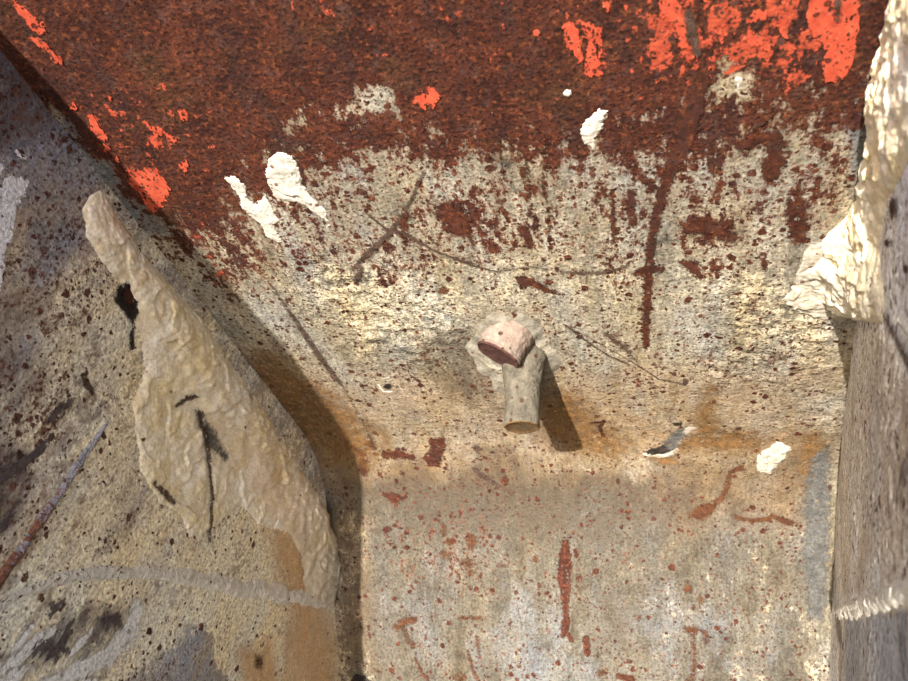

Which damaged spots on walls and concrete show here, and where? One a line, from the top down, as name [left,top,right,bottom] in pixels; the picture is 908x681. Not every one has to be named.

corrosion [703,141,716,174]
corrosion [734,109,791,181]
corrosion [399,210,411,241]
corrosion [431,198,475,250]
corrosion [516,138,554,252]
corrosion [608,191,616,244]
corrosion [620,70,711,349]
corrosion [676,213,744,261]
corrosion [785,181,814,246]
corrosion [515,275,564,296]
corrosion [556,537,591,657]